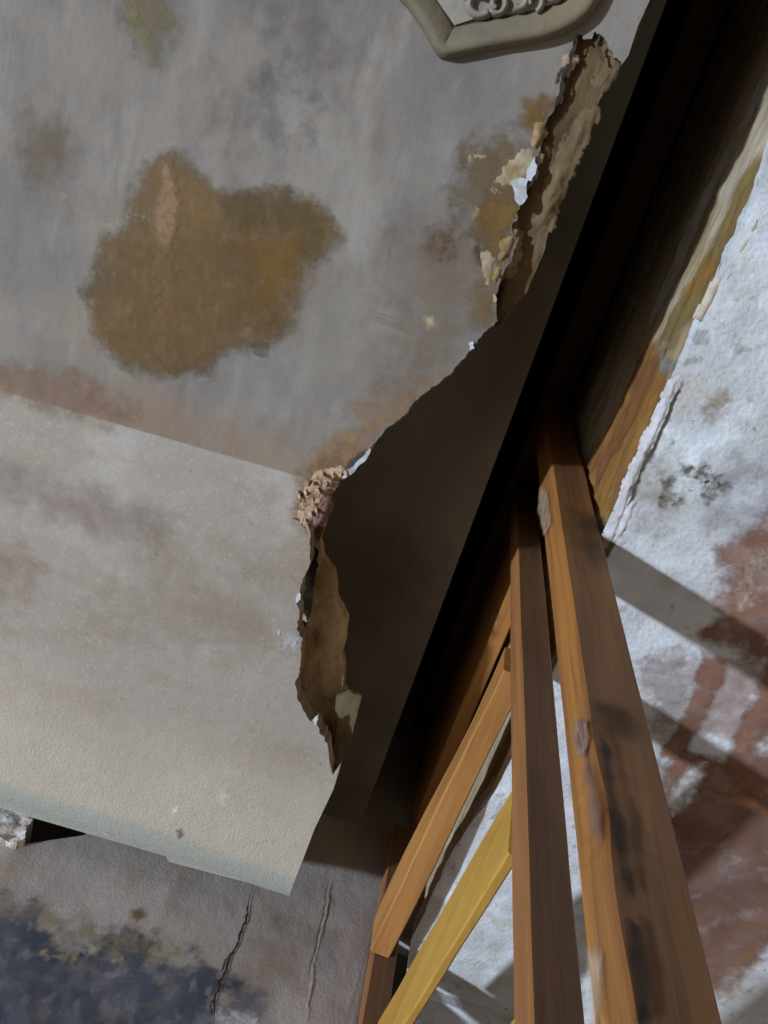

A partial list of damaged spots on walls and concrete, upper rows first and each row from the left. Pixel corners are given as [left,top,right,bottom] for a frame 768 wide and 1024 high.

leakage [83,152,342,375]
flaking render [458,33,626,327]
leakage [584,69,768,525]
peeling [277,447,372,771]
crack [209,888,253,1024]
leakage [215,1010,257,1024]
crack [304,880,332,1024]